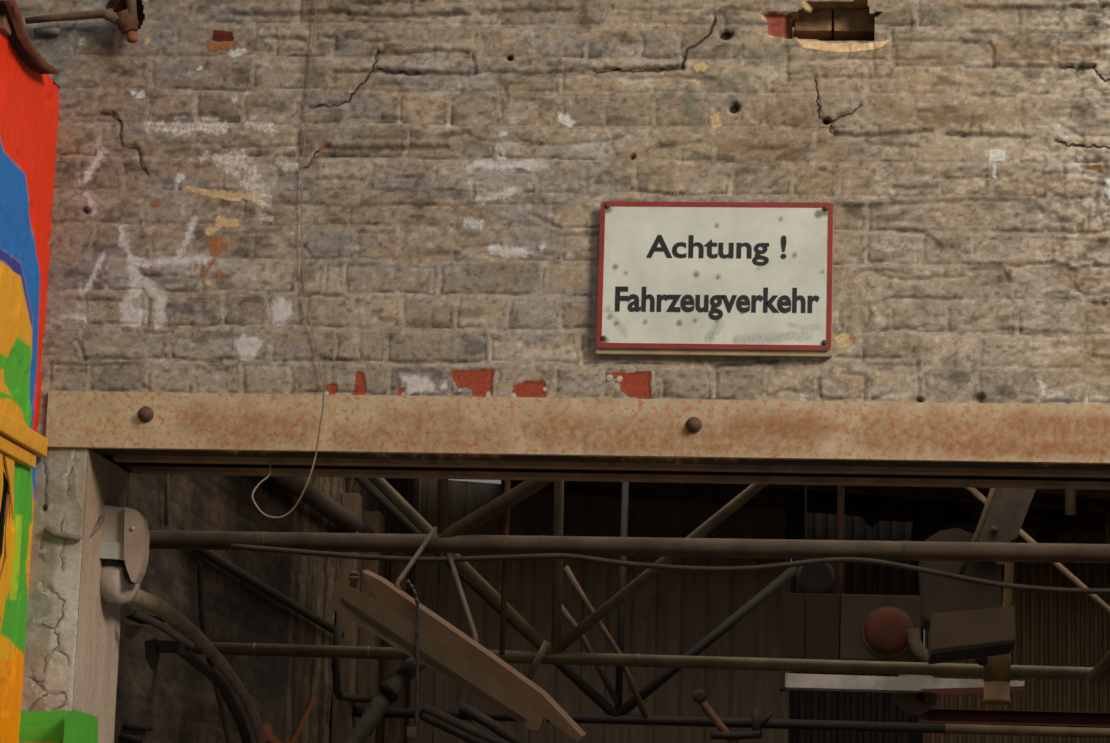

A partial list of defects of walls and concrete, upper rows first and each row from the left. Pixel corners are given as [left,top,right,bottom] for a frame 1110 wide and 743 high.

crack [595,14,717,73]
spalling [761,0,890,53]
crack [309,52,424,108]
crack [1063,65,1110,82]
crack [814,78,861,136]
crack [100,112,149,176]
crack [1054,139,1110,149]
spalling [452,369,494,397]
spalling [606,371,652,398]